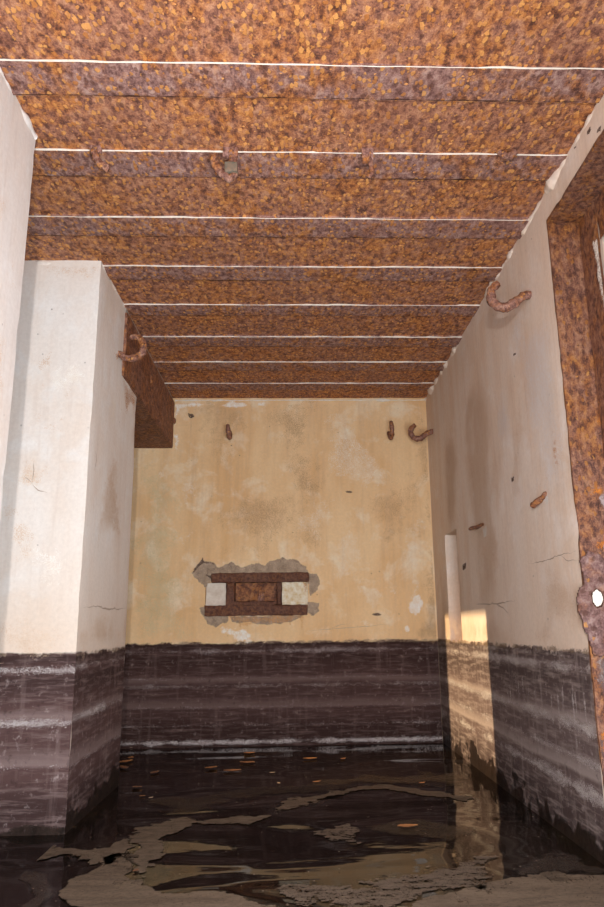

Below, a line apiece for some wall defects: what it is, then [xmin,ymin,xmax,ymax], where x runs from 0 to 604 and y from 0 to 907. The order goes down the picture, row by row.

spalling [192,557,320,628]
damp [0,369,604,865]